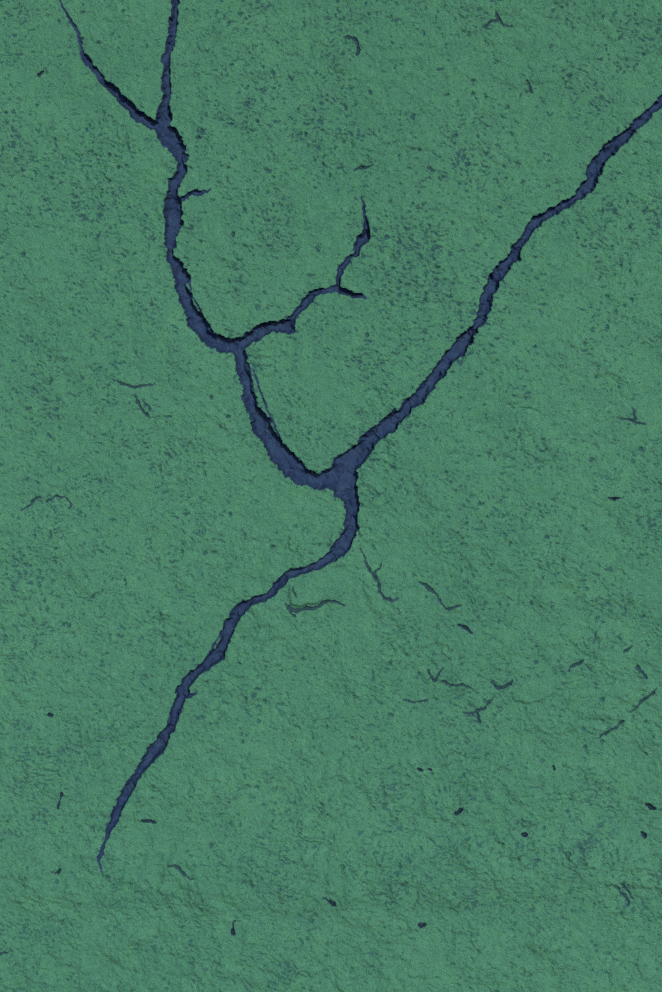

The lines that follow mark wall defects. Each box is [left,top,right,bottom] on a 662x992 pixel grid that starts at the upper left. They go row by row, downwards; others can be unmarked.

crack [482,11,513,29]
crack [331,94,662,480]
crack [59,0,373,876]
crack [359,548,400,603]
crack [418,581,462,611]
crack [402,667,513,723]
crack [568,659,584,672]
crack [599,645,657,739]